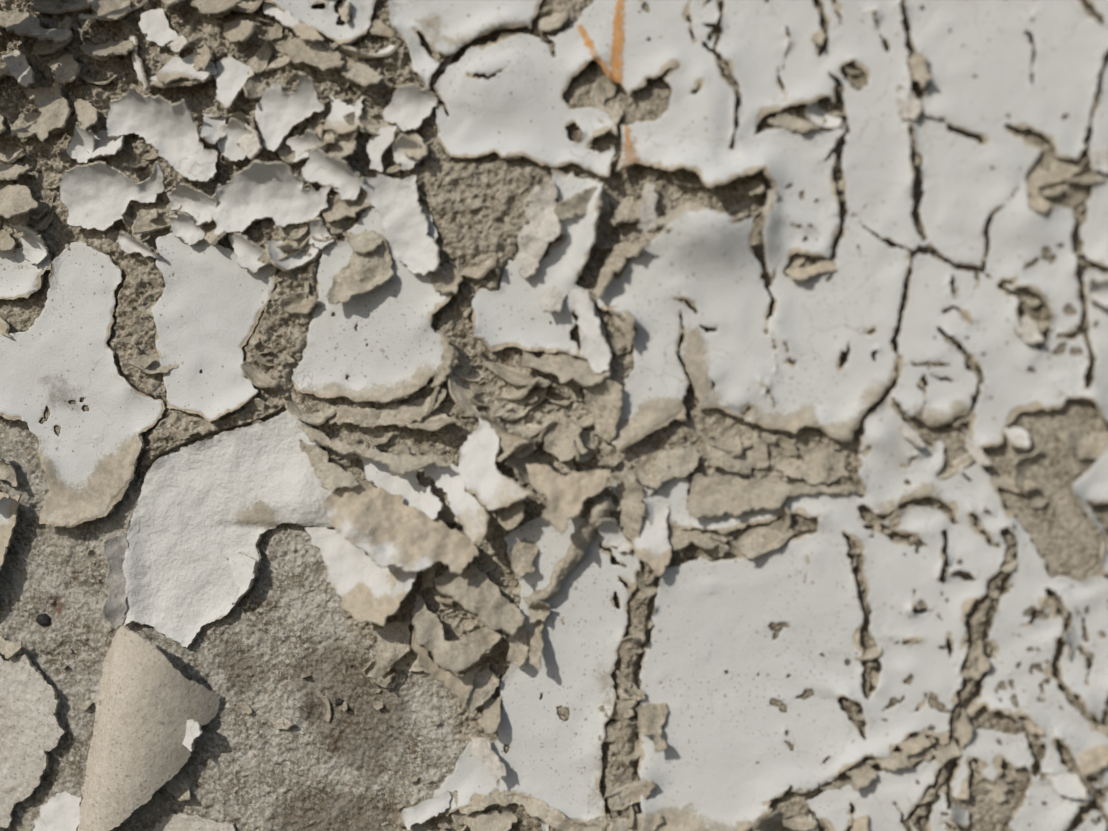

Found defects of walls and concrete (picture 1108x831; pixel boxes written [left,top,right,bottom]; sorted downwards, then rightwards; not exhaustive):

crack [686,0,742,150]
peeling [896,52,933,121]
flaking render [0,0,870,831]
crack [675,298,717,416]
crack [770,0,1019,831]
flaking render [899,392,1108,582]
crack [1056,204,1108,389]
peeling [1088,277,1108,308]
peeling [846,644,1108,831]
spalling [1023,606,1049,620]
crack [1028,588,1108,737]
crack [1035,739,1108,831]